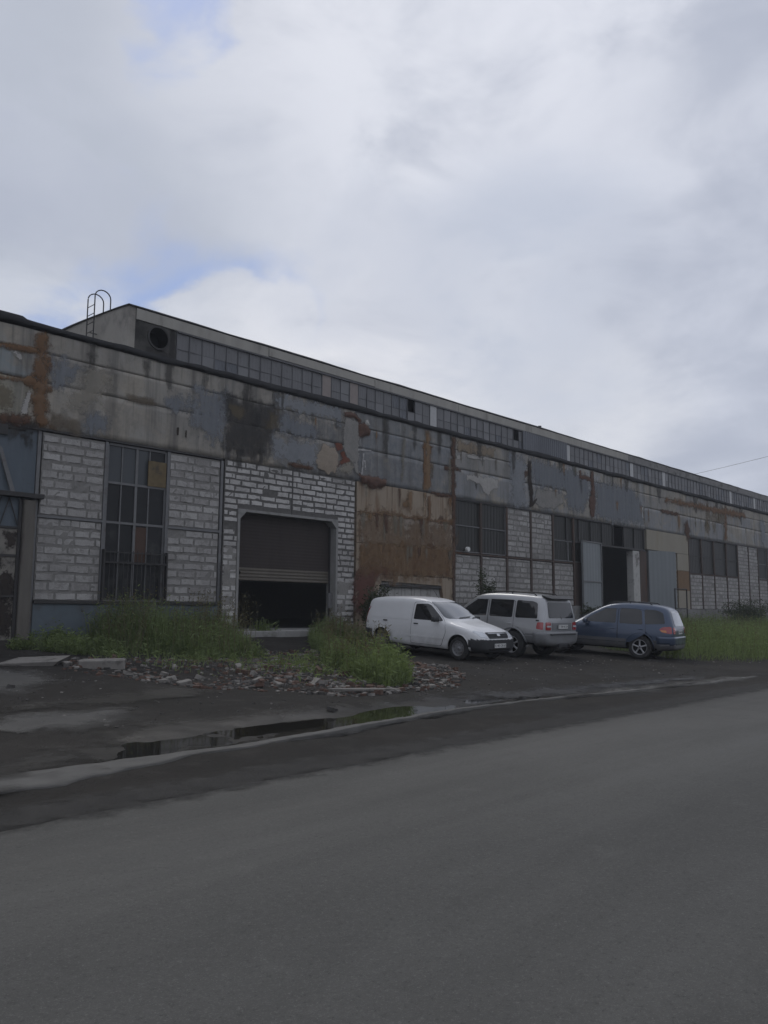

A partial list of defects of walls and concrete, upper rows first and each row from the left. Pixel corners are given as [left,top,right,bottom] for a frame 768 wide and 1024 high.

rust [0,332,55,430]
water stain [226,384,284,467]
peeling [272,393,360,475]
rust [358,432,461,597]
rust [579,470,596,517]
rust [660,497,746,541]